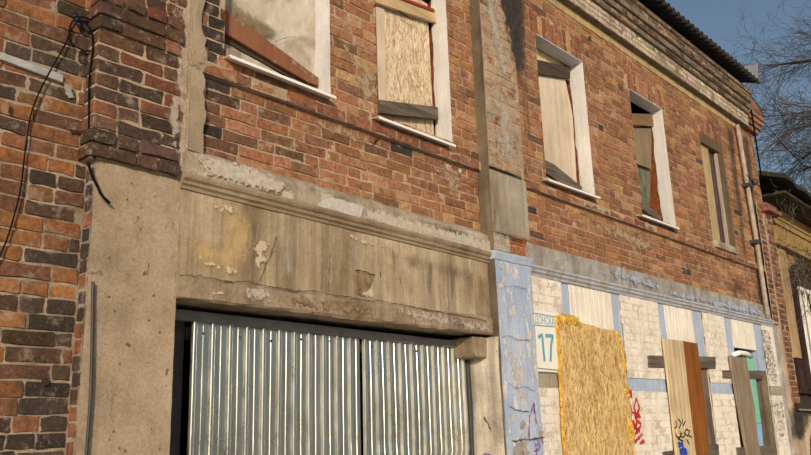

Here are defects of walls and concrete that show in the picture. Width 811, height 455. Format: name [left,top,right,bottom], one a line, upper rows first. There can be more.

leakage [491,80,515,160]
peeling [198,156,294,199]
peeling [195,202,270,274]
peeling [318,193,490,251]
peeling [246,286,275,302]
spalling [291,270,375,318]
crack [181,237,486,325]
peeling [393,306,491,333]